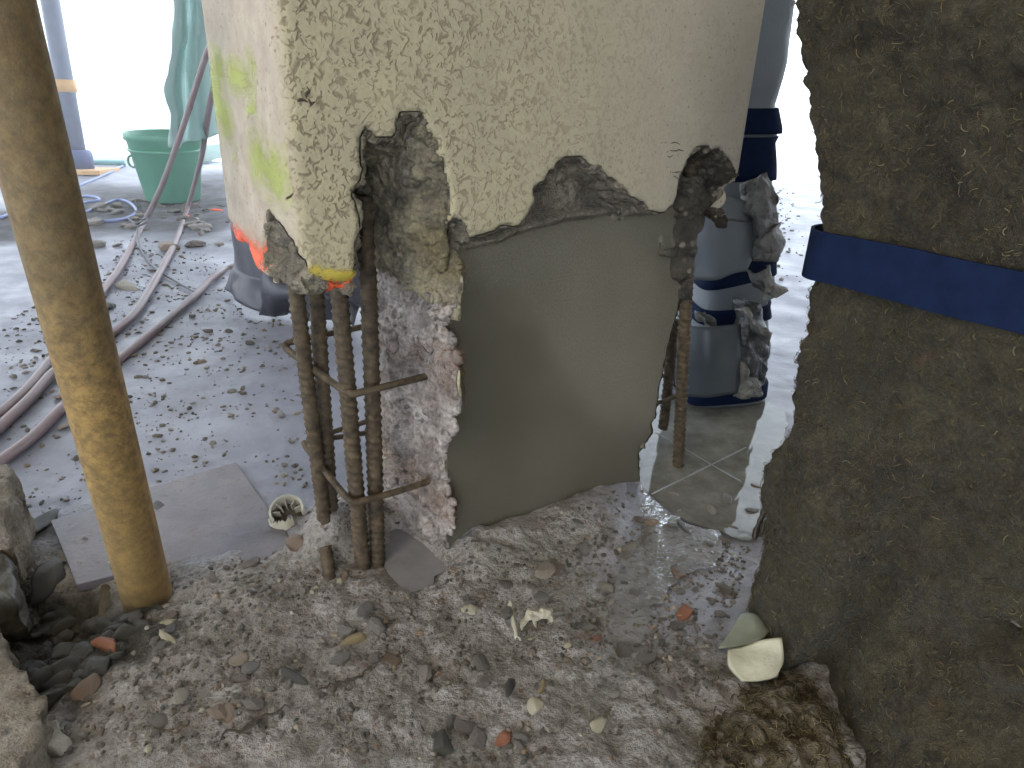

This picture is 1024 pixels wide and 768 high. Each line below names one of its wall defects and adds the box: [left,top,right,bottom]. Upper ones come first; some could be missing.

spalling [263,111,739,549]